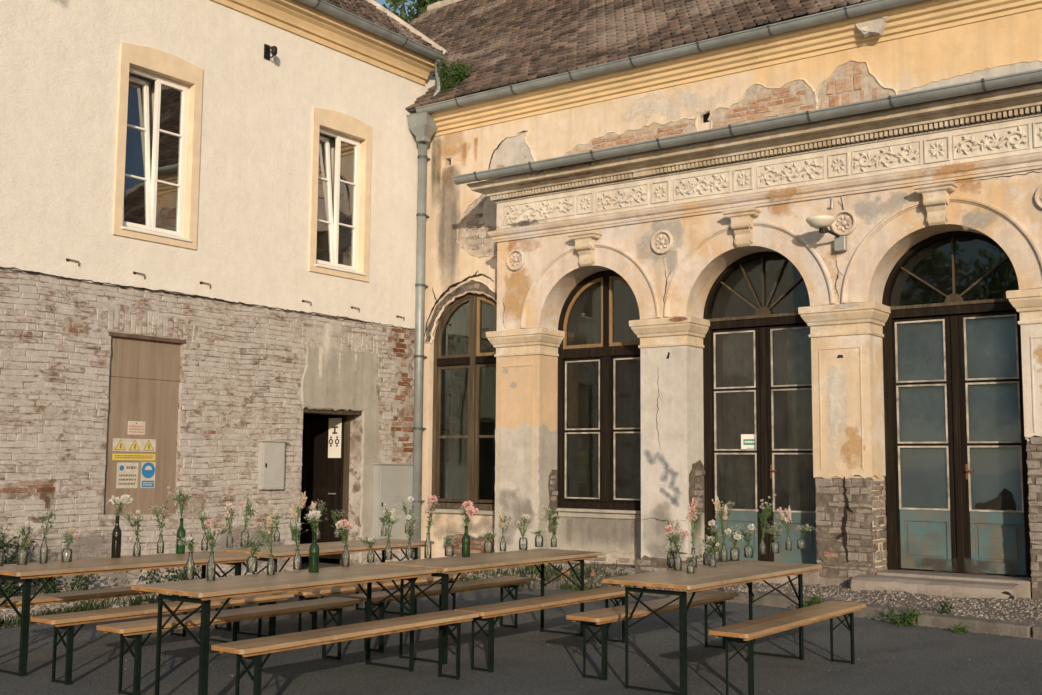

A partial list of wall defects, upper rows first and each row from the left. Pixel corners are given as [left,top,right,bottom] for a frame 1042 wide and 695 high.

spalling [564,58,1042,156]
peeling [489,130,536,170]
spalling [456,194,497,259]